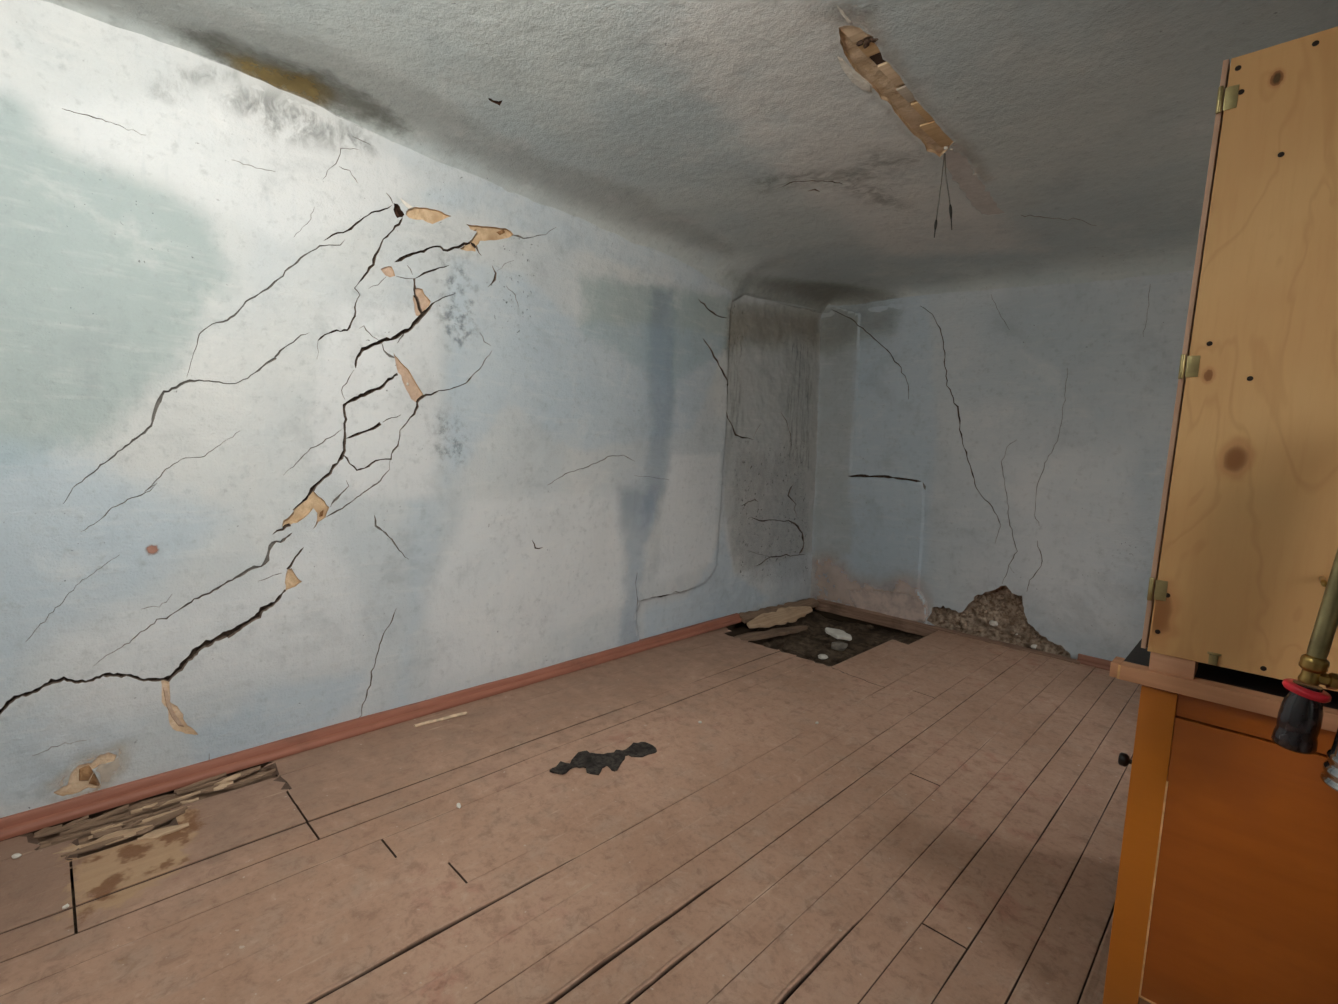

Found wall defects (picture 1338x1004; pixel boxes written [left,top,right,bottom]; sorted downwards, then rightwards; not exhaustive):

water stain [194,36,396,126]
spalling [393,198,450,224]
spalling [460,224,513,251]
spalling [394,354,423,402]
crack [831,309,909,399]
crack [0,137,556,717]
crack [921,306,1068,590]
crack [849,474,926,489]
spalling [282,492,329,528]
spalling [926,585,1071,658]
peeling [161,680,198,735]
peeling [53,752,117,796]